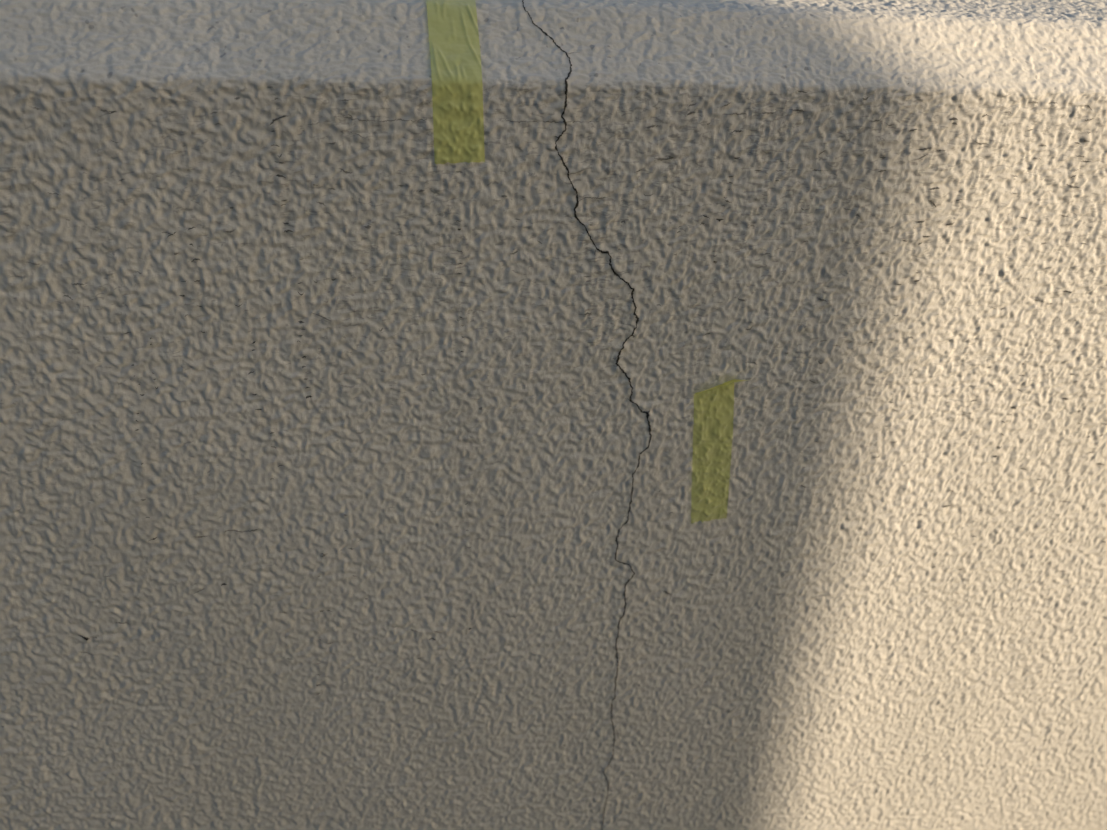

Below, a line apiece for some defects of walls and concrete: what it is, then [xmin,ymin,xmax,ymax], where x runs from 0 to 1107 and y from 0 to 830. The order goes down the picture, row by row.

crack [500,0,652,829]